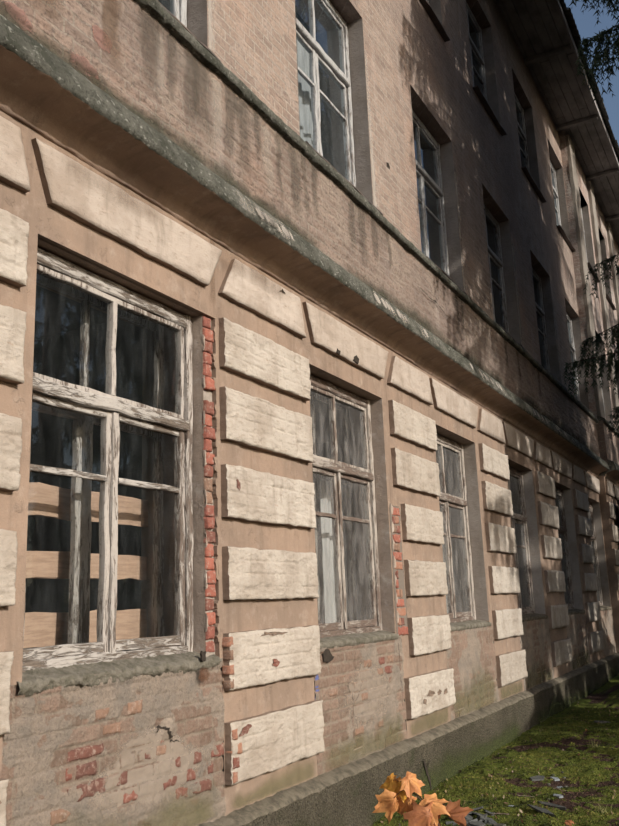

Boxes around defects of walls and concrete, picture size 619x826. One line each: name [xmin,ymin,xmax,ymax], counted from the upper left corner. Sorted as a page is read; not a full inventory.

water stain [368,102,377,208]
water stain [256,208,293,239]
flaking render [202,316,234,689]
flaking render [65,707,252,815]